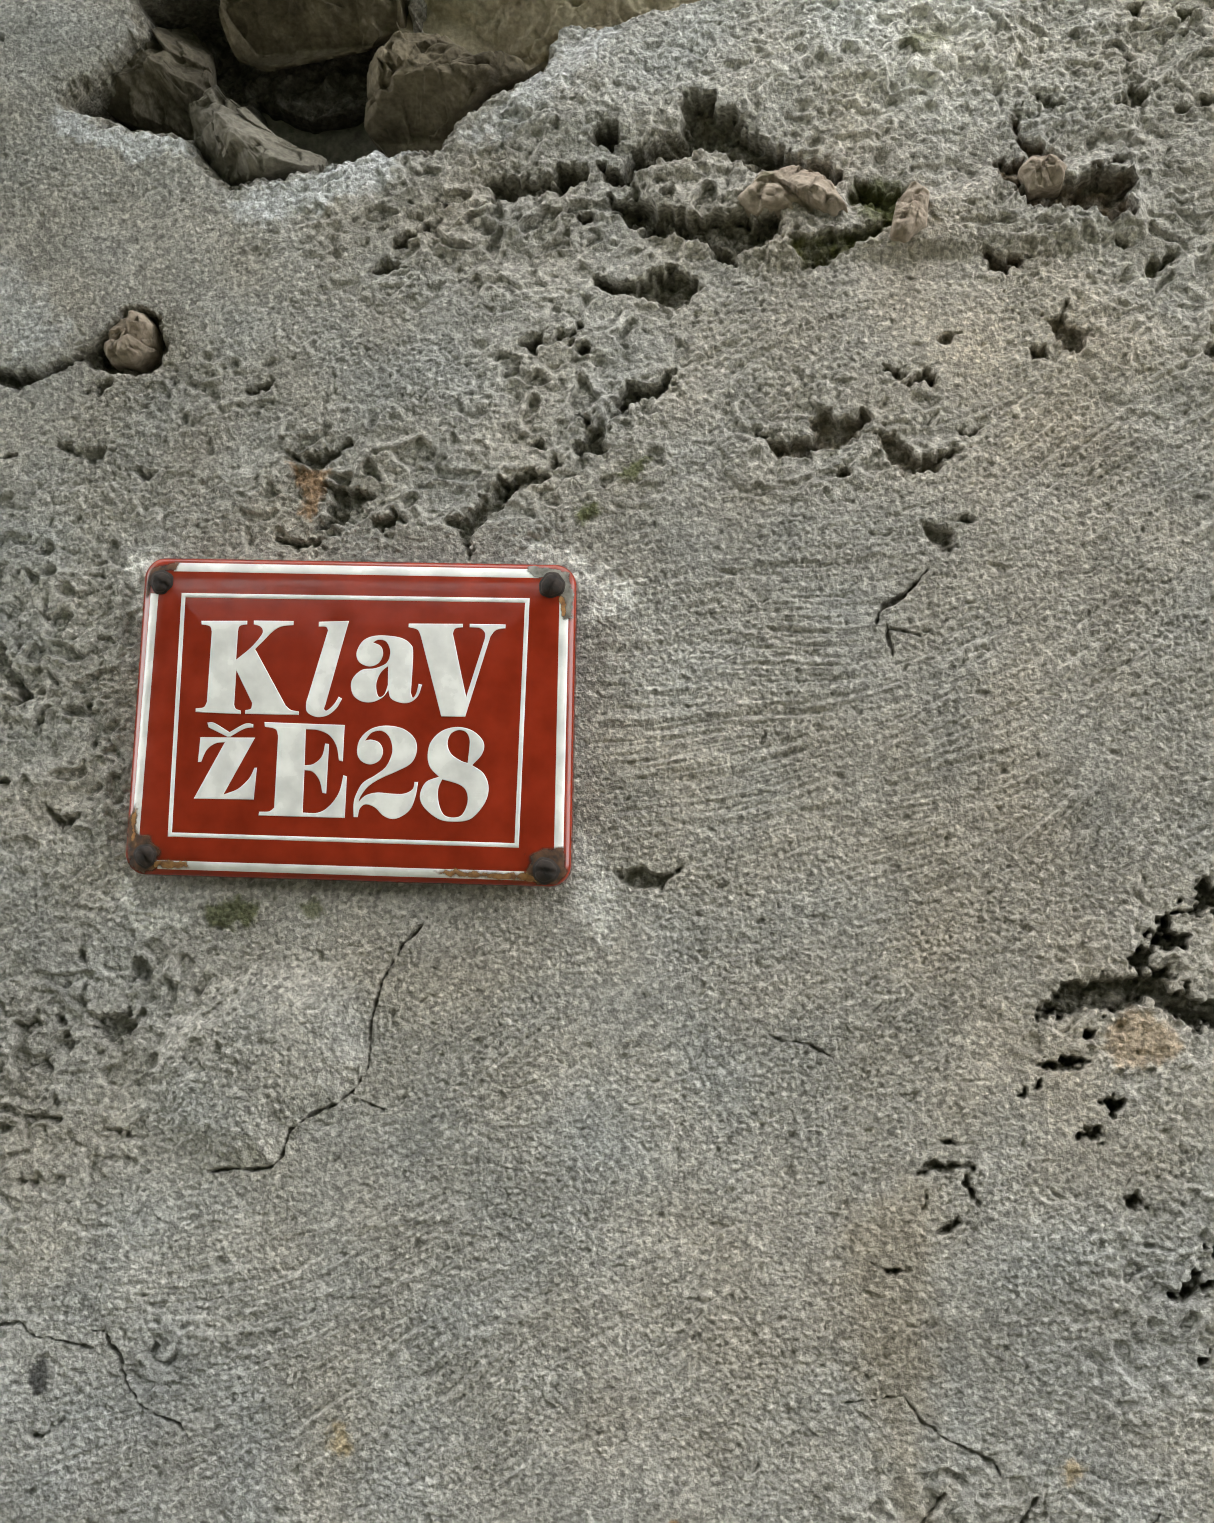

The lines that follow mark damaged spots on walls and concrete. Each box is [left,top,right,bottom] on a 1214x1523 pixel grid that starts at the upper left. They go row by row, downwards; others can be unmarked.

spalling [56,0,557,193]
crack [0,451,19,459]
crack [209,915,428,1173]
spalling [1016,876,1214,1098]
spalling [1075,1092,1128,1145]
crack [0,1319,188,1438]
crack [840,1395,1040,1523]